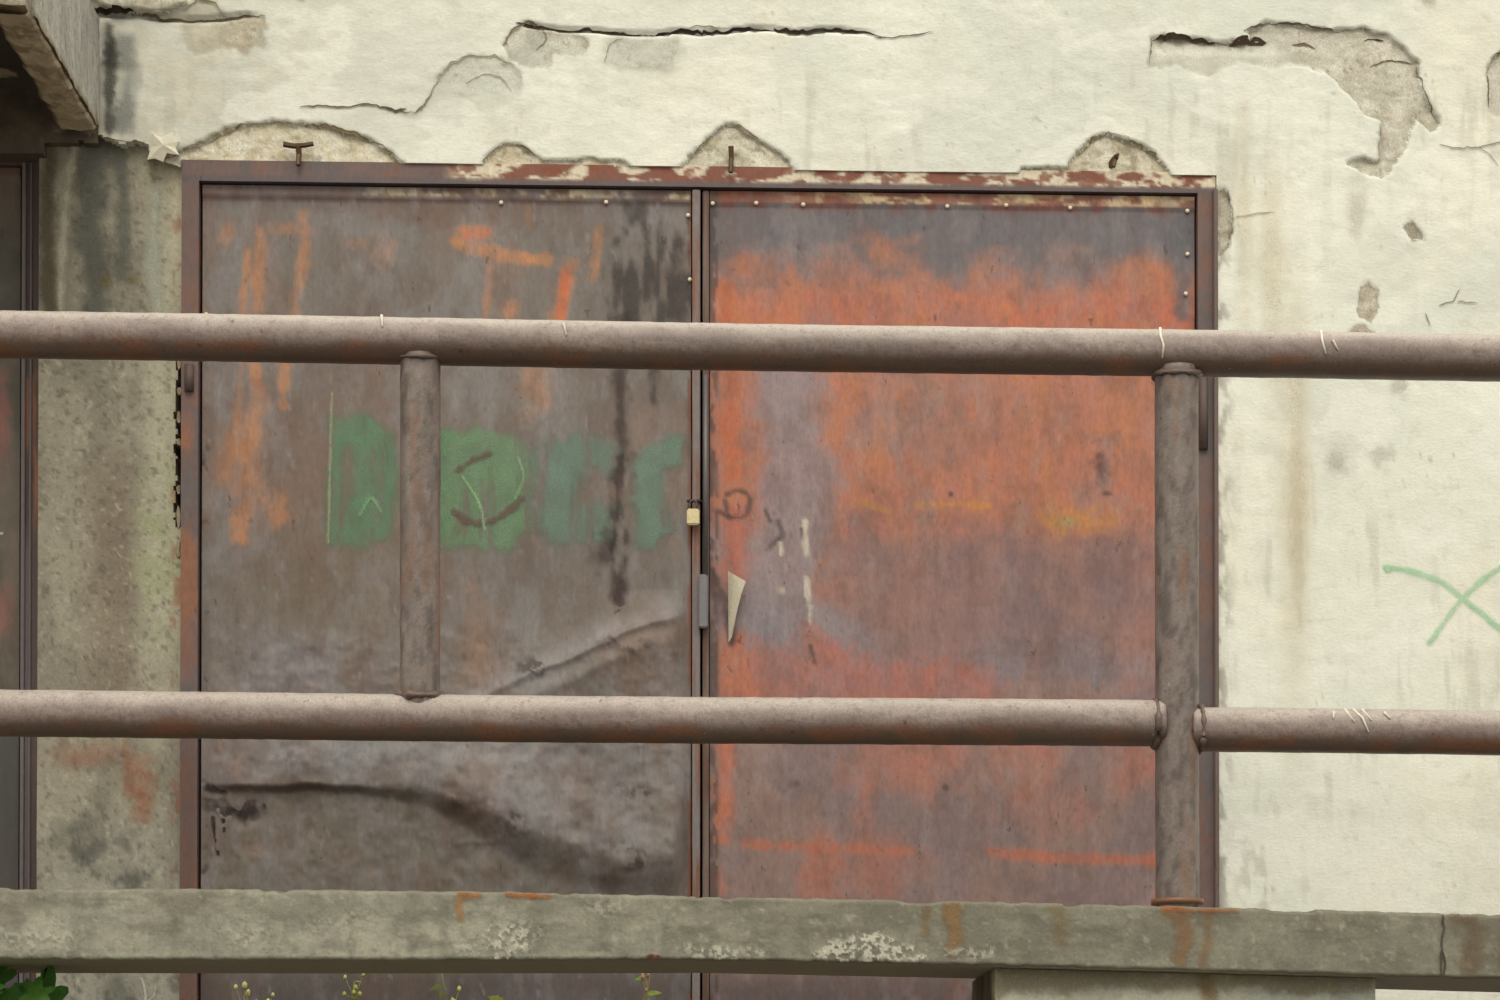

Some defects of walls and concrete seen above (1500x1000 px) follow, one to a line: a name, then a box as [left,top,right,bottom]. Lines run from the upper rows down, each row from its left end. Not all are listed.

crack [516,22,930,50]
spalling [0,11,400,167]
crack [300,94,432,113]
peeling [1149,22,1440,178]
peeling [1487,52,1500,106]
water stain [41,24,134,312]
spalling [682,124,791,168]
spalling [1021,131,1169,172]
water stain [613,209,690,322]
spalling [1350,284,1379,333]
water stain [599,370,626,604]
rust [205,784,266,856]